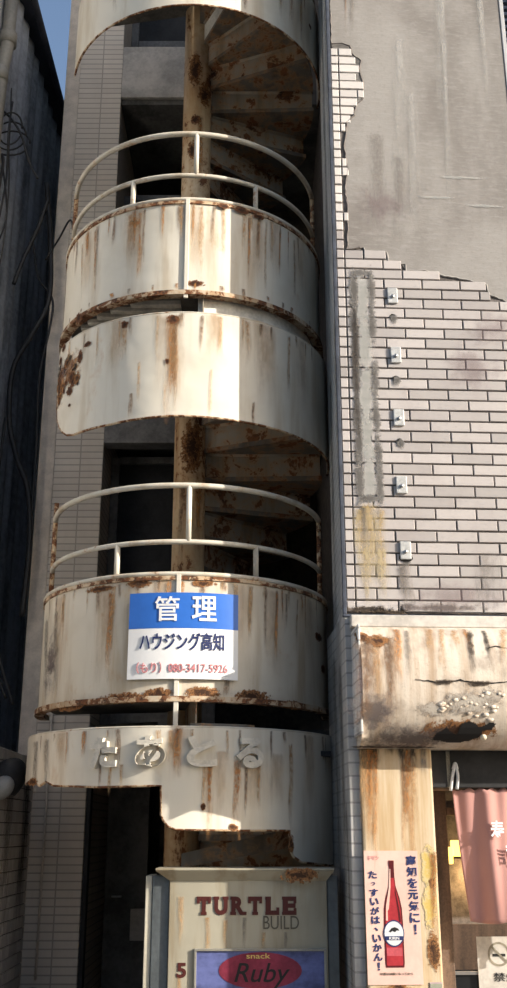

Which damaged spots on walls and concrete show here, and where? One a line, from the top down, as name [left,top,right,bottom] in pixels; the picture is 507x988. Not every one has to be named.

rust [187,54,210,168]
spalling [329,0,507,302]
rust [178,204,295,280]
rust [165,313,183,384]
rust [180,419,203,473]
rust [179,488,202,531]
rust [87,580,236,656]
water stain [347,604,487,615]
rust [100,680,270,704]
rust [354,629,410,728]
rust [419,719,497,740]
rust [401,749,416,819]